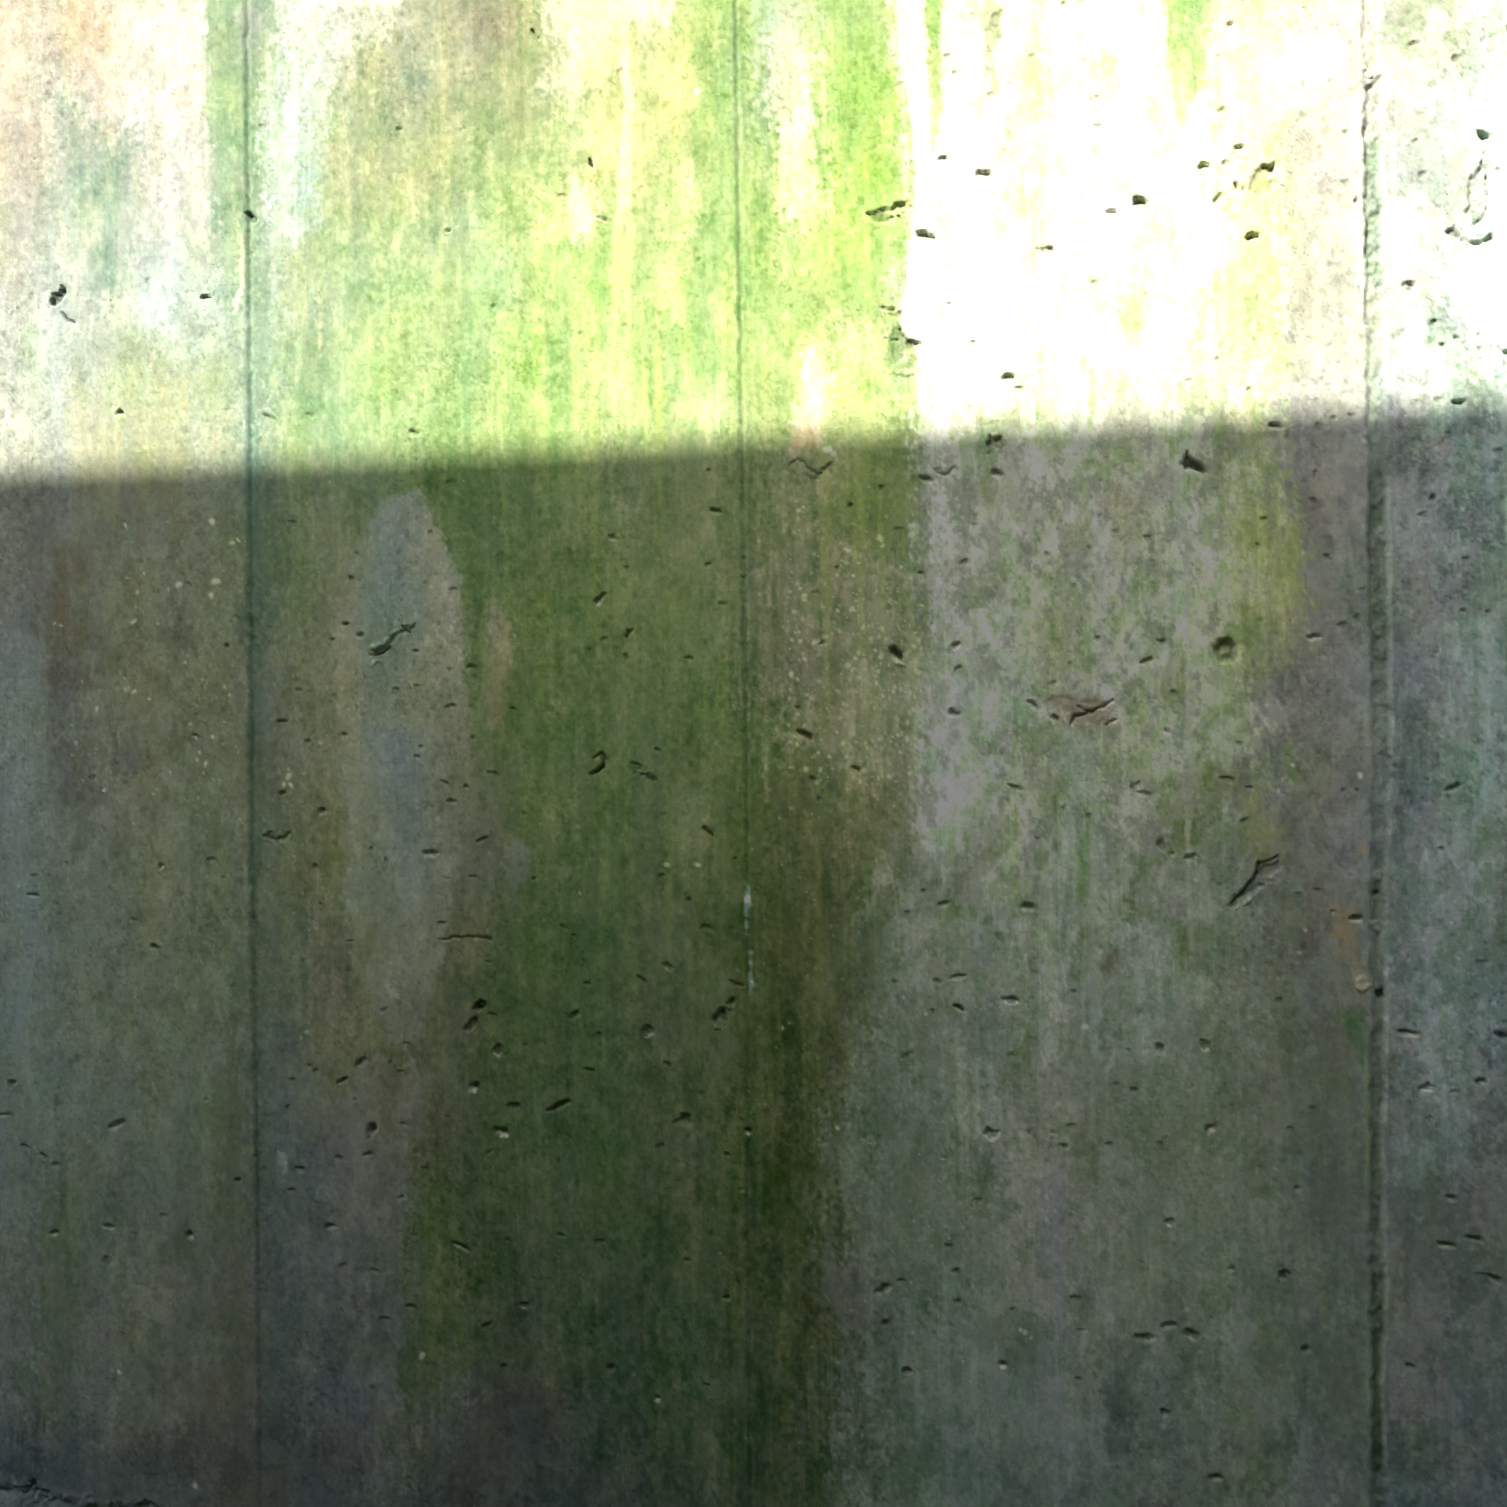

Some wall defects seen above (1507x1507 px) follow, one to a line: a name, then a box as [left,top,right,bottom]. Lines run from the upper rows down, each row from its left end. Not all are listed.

crack [0,1477,162,1507]
leakage [0,0,704,1507]
leakage [664,0,1507,1507]